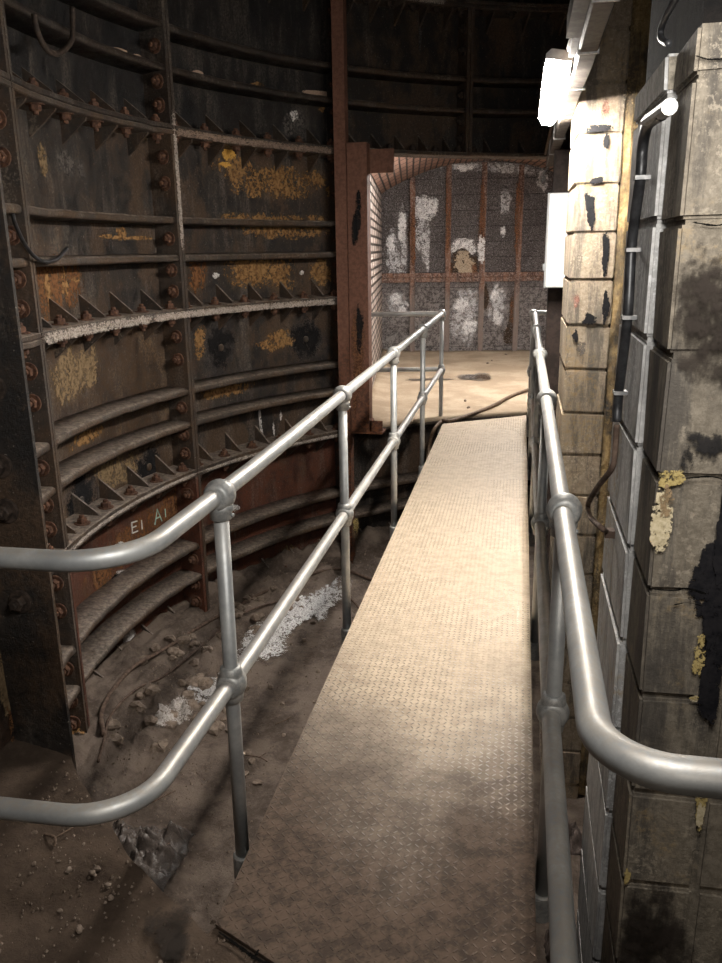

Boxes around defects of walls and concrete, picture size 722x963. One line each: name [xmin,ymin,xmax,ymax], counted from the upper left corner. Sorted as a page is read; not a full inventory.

corrosion [36,254,84,321]
spalling [451,246,479,273]
leakage [675,266,722,355]
corrosion [351,303,365,415]